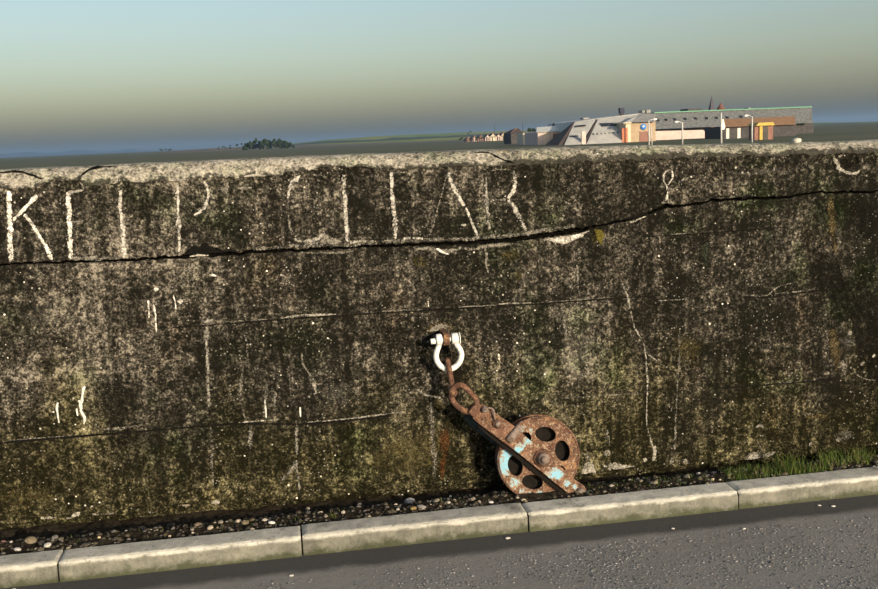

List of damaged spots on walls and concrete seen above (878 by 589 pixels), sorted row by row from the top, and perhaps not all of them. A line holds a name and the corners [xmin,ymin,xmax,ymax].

crack [0,190,878,266]